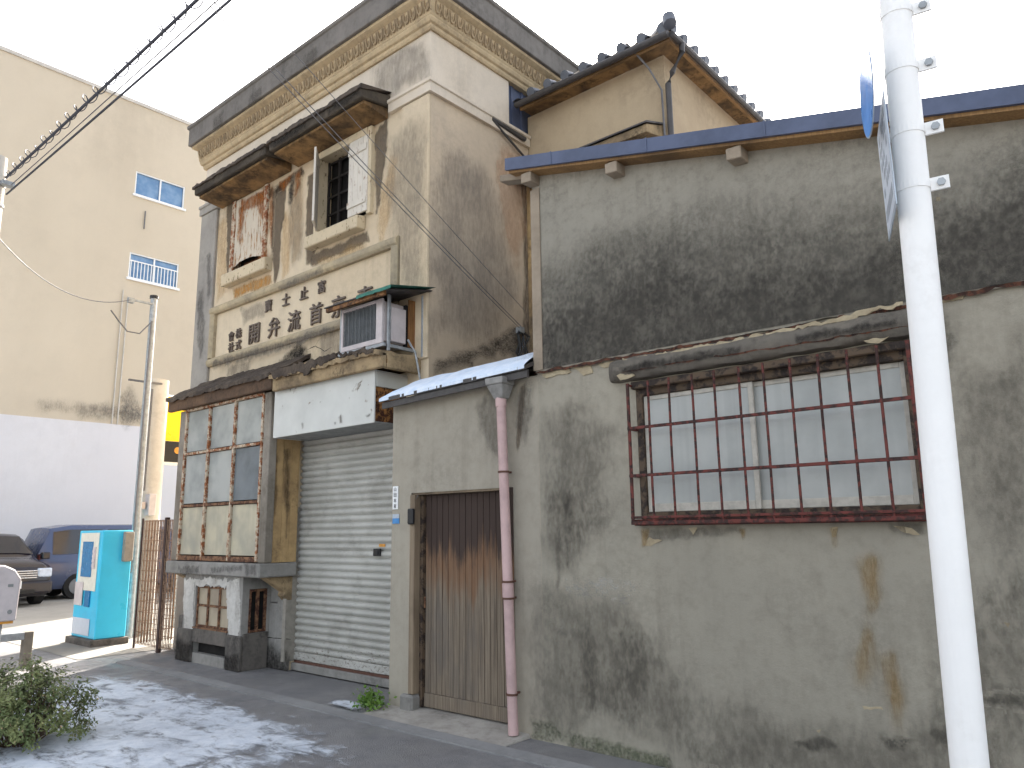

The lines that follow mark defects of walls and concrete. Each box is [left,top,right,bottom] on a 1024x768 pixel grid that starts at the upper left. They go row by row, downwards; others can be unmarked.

rust [239,170,300,242]
mould [933,192,1024,292]
leakage [543,227,905,373]
peeling [183,576,241,636]